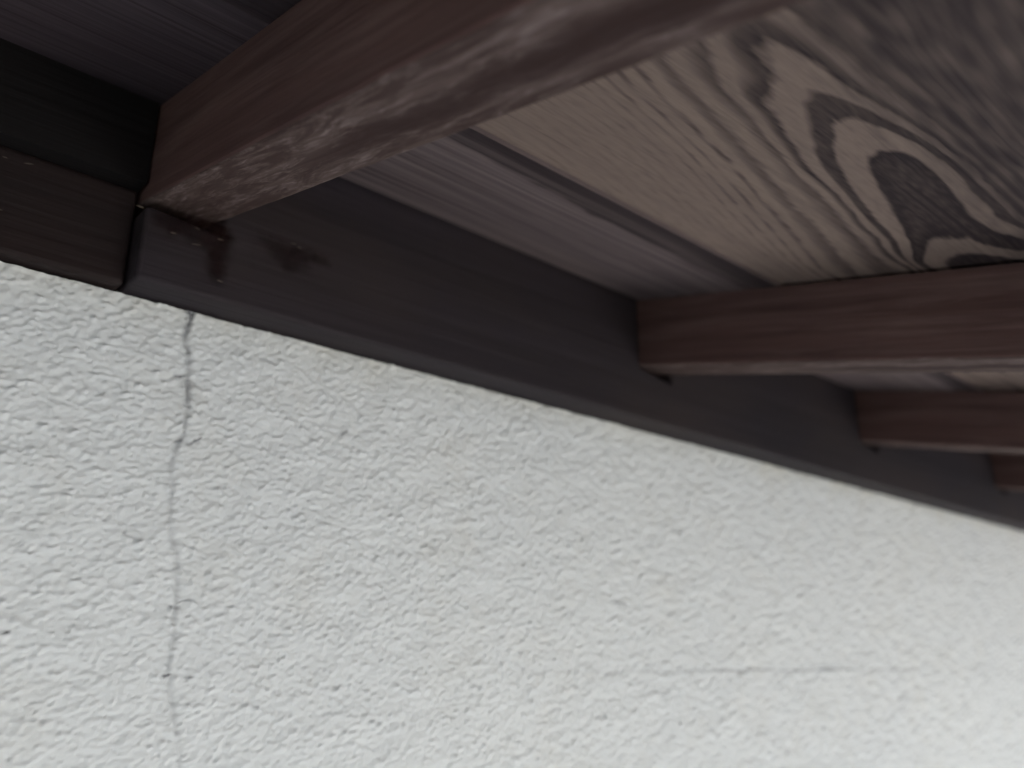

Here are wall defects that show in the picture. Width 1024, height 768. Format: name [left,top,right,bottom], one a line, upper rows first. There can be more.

crack [185,310,194,335]